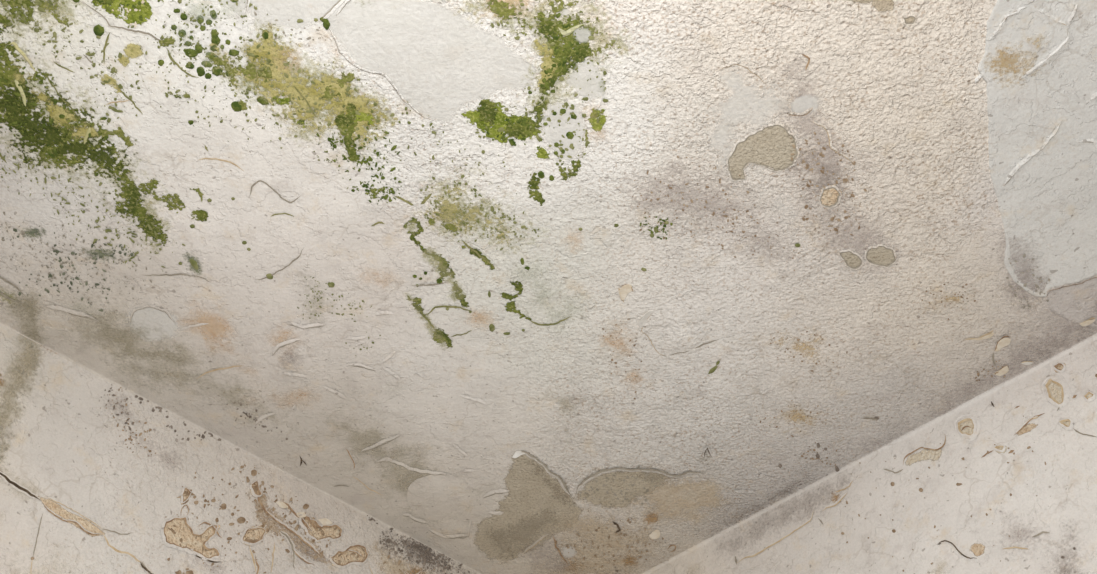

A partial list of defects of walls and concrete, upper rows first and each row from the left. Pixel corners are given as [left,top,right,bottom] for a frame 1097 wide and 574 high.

leakage [135,0,326,149]
leakage [347,164,413,205]
leakage [0,212,152,313]
leakage [178,254,202,273]
leakage [297,276,372,322]
peeling [1006,254,1097,329]
peeling [903,434,946,465]
peeling [1014,413,1044,435]
crack [0,471,43,569]
crack [103,534,155,574]
peeling [161,465,435,574]
leakage [367,515,470,574]